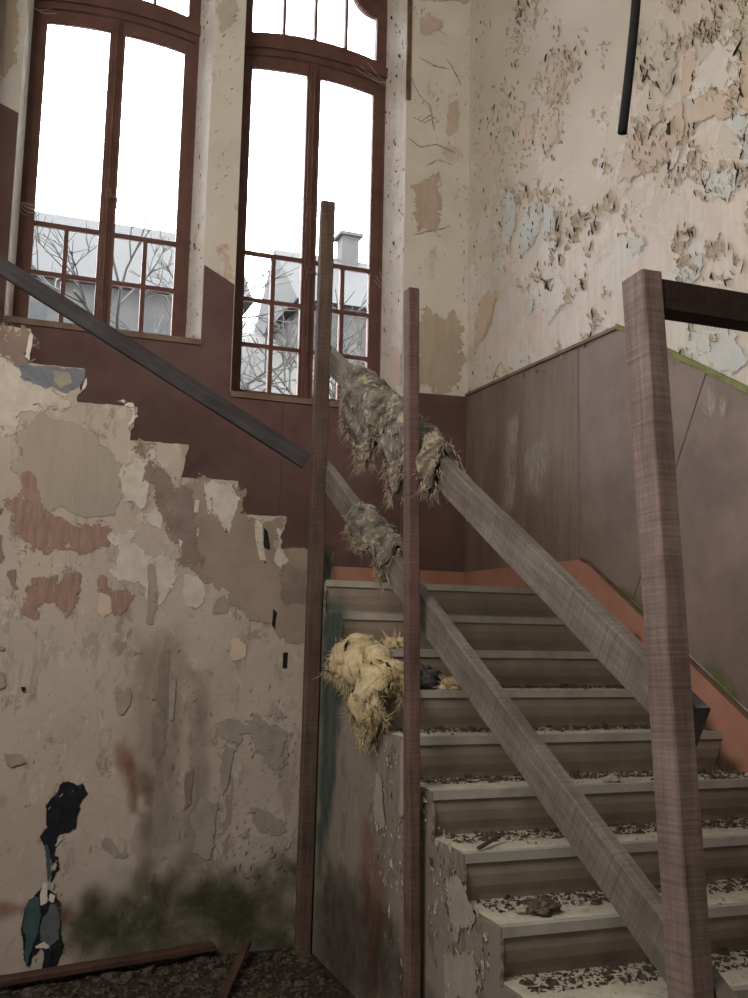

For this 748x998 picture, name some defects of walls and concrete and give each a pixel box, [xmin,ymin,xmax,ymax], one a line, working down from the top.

peeling [200,0,241,76]
flaking render [118,400,138,427]
peeling [0,438,308,668]
spalling [21,781,88,969]
mould [71,868,297,960]
peeling [428,826,491,998]